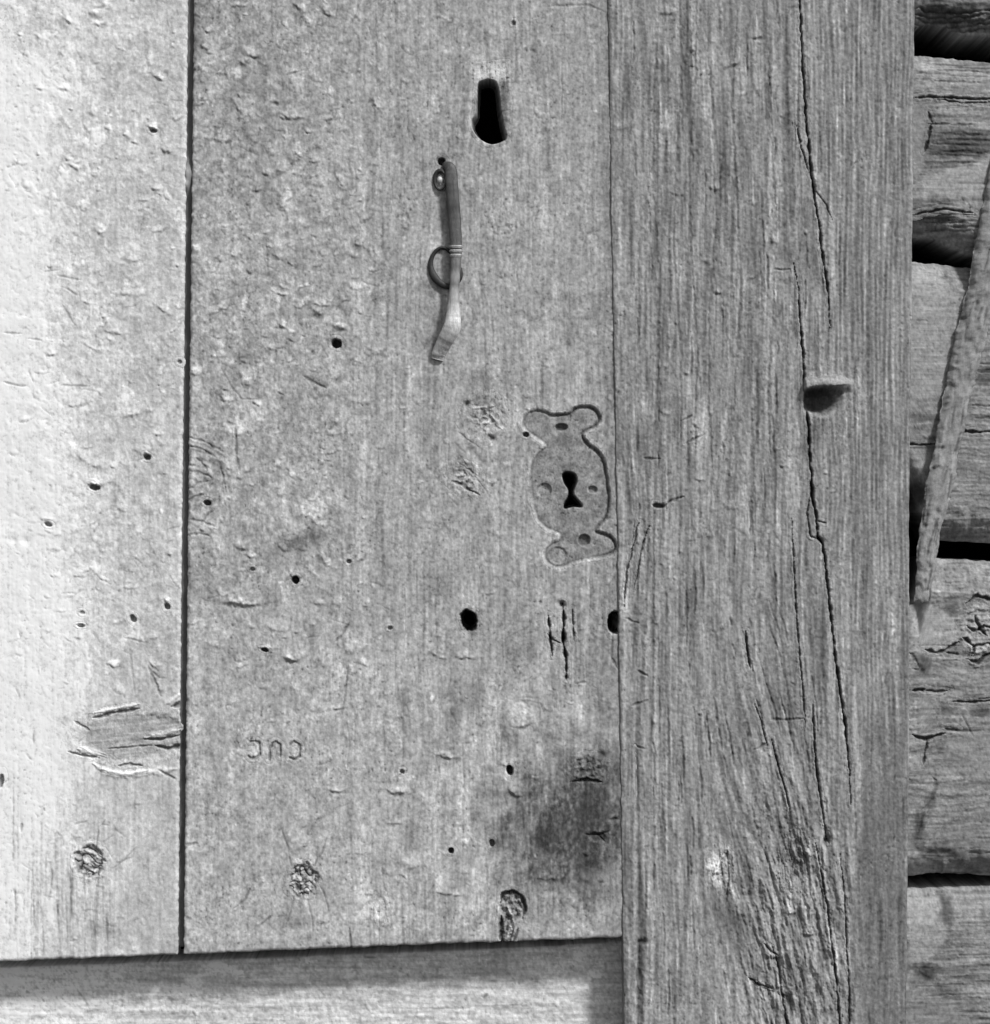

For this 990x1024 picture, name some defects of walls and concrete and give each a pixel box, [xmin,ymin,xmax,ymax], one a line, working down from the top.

crack [745,0,856,1024]